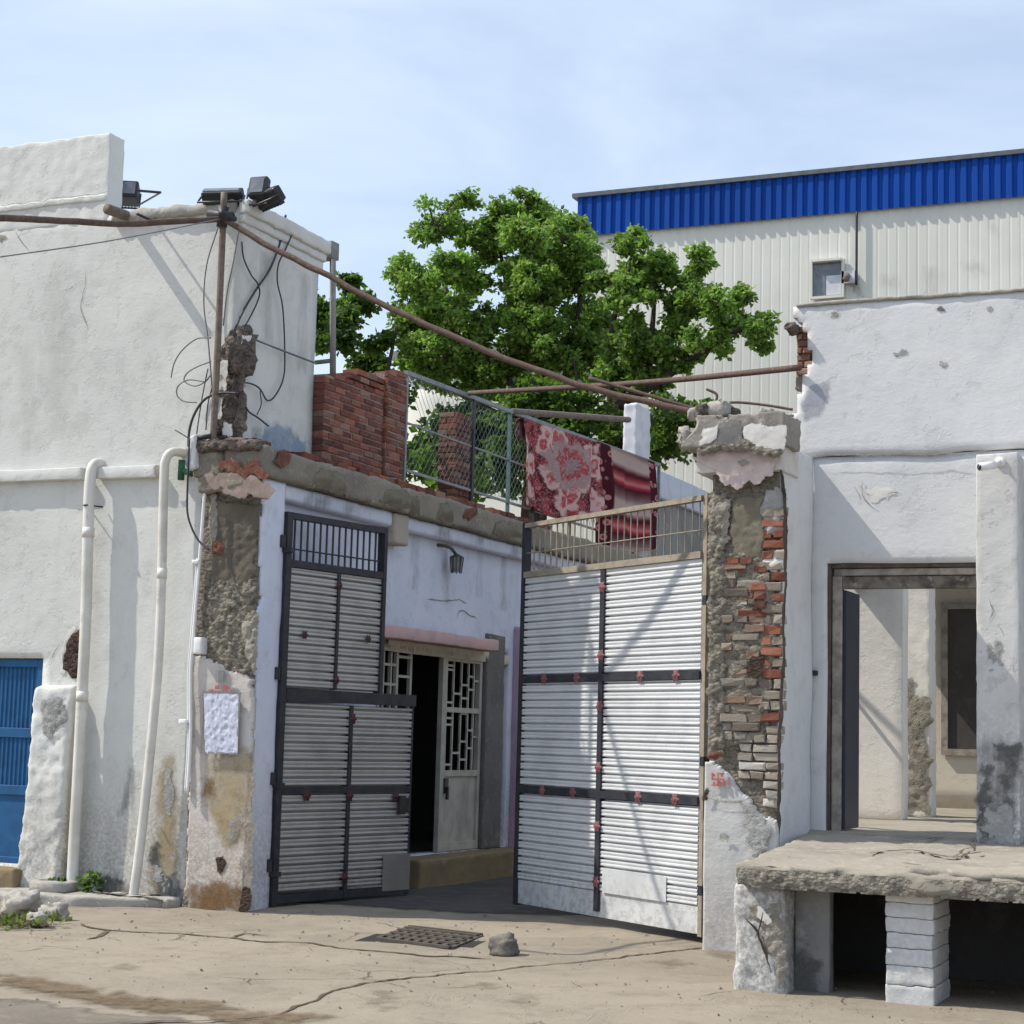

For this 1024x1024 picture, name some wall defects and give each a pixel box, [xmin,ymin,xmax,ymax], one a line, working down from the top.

flaking render [189,325,551,675]
flaking render [46,625,80,679]
flaking render [676,419,1024,904]
damp [149,759,183,900]
damp [203,753,250,845]
crack [870,836,1024,884]
damp [975,742,1024,845]
crack [80,923,697,1024]